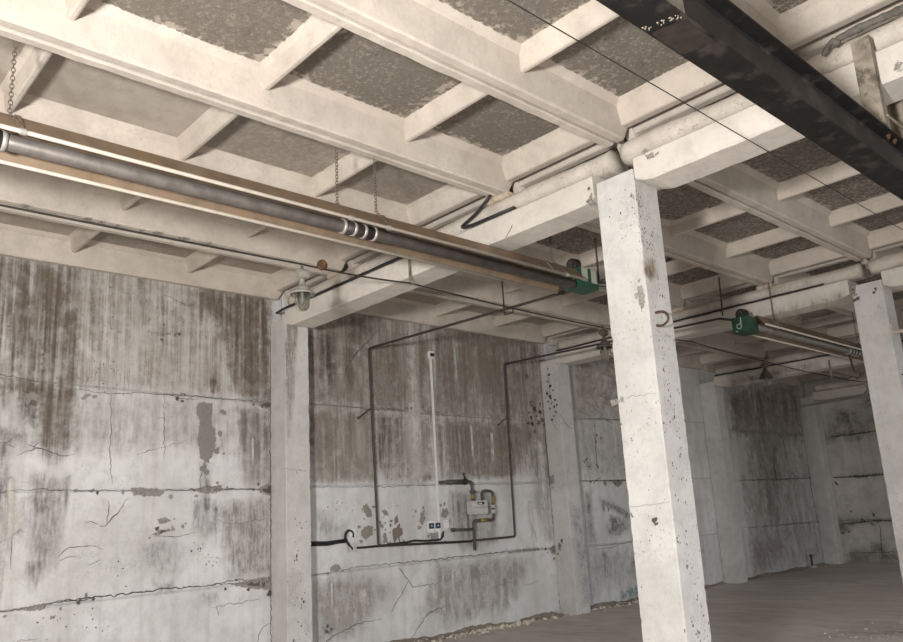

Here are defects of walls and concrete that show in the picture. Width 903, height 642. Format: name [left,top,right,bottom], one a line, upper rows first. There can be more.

damp [0,256,268,447]
crack [0,326,307,642]
spalling [149,517,187,539]
flaking render [191,402,240,497]
damp [204,504,269,572]
flaking render [352,504,408,549]
flaking render [412,502,450,542]
damp [309,315,558,509]
crack [312,358,655,642]